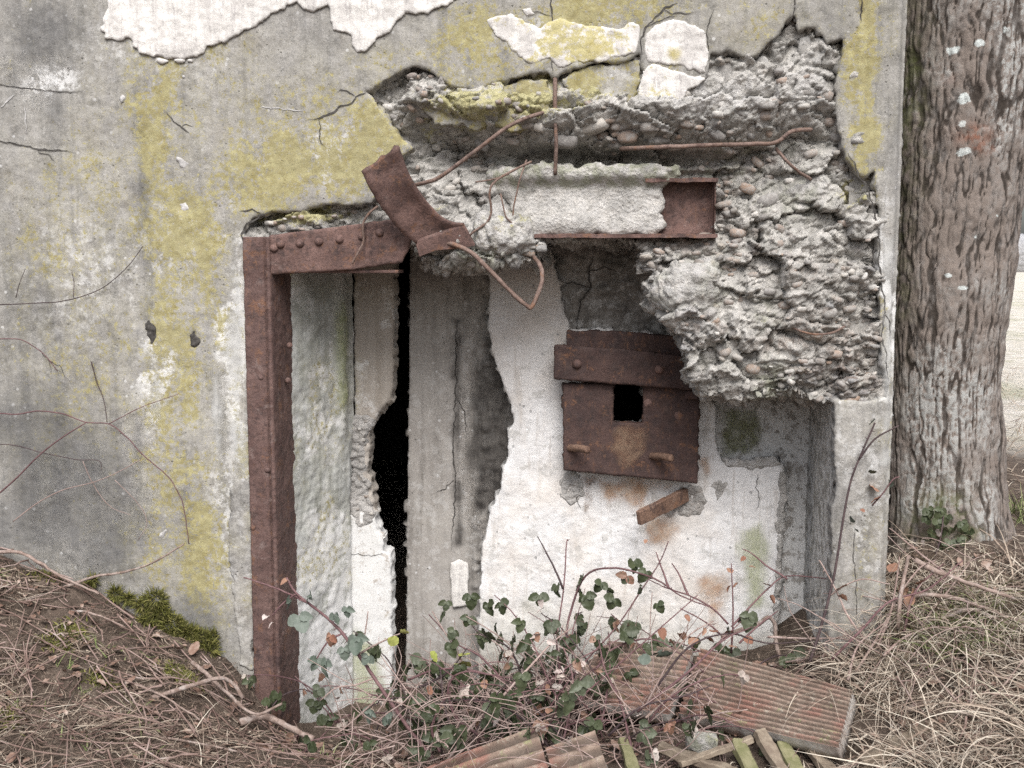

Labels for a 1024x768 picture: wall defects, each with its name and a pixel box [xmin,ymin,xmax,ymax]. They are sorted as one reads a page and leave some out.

flaking render [100,0,455,79]
crack [0,84,74,160]
crack [260,90,368,145]
spalling [245,201,390,237]
spalling [368,5,887,410]
spalling [350,415,376,528]
peeling [450,559,469,608]